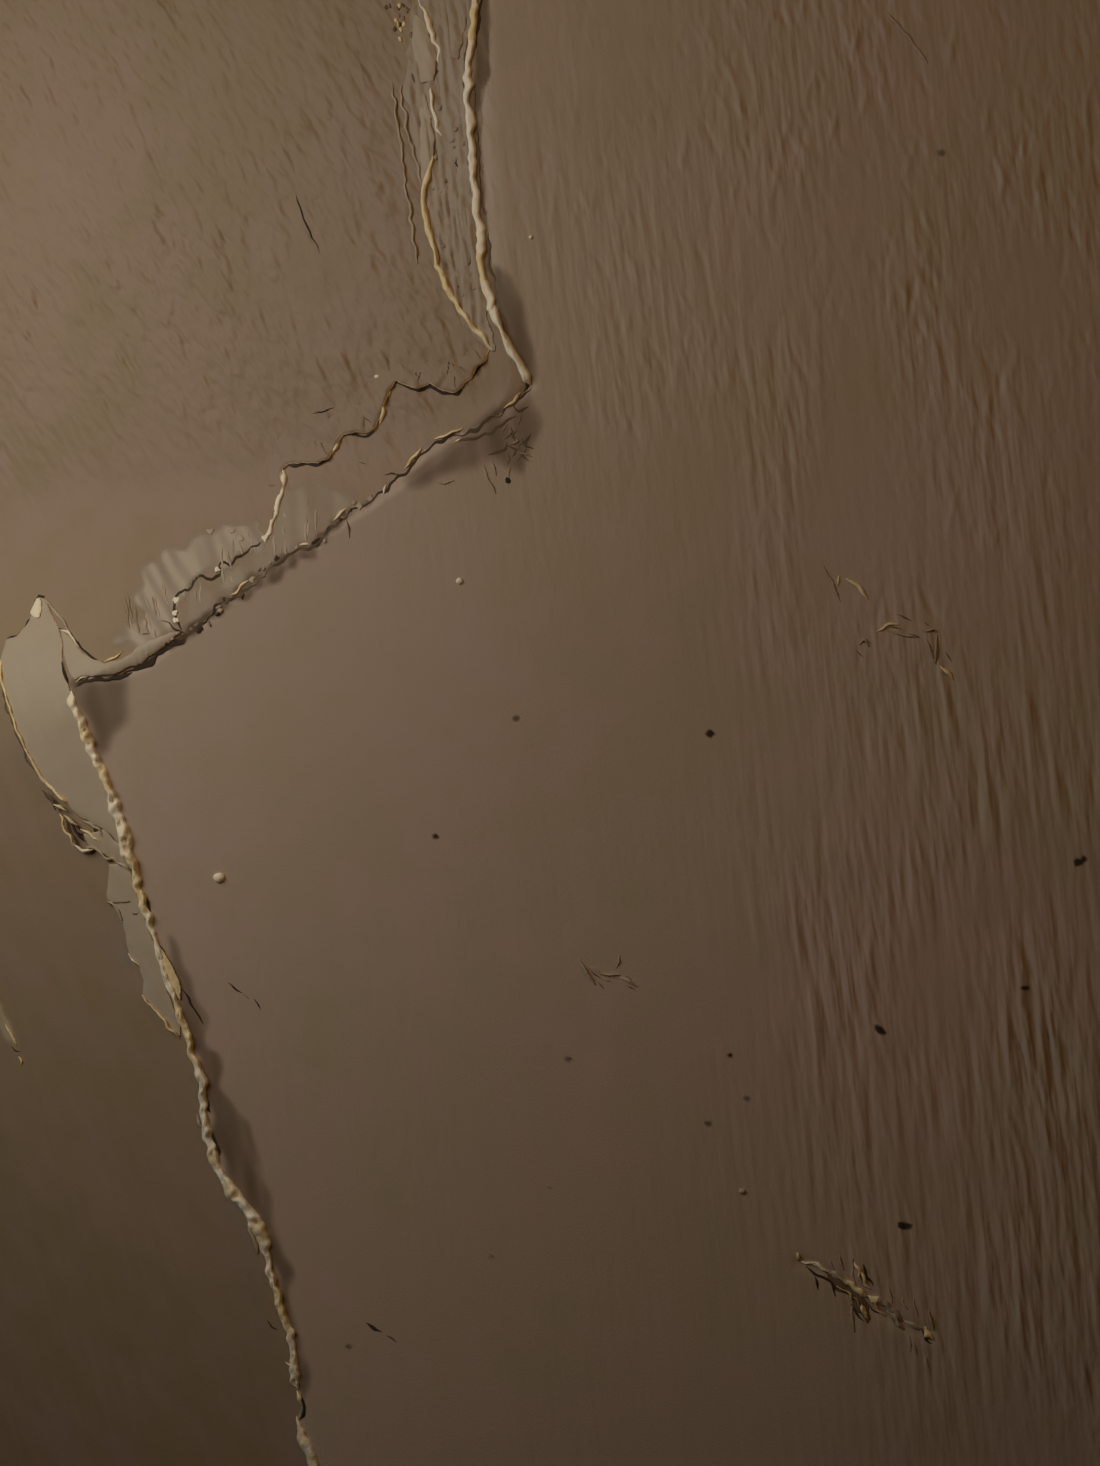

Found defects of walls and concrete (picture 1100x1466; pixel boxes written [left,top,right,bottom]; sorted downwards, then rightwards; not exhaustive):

peeling [384,0,495,352]
peeling [0,471,350,1039]
spalling [796,1253,935,1375]